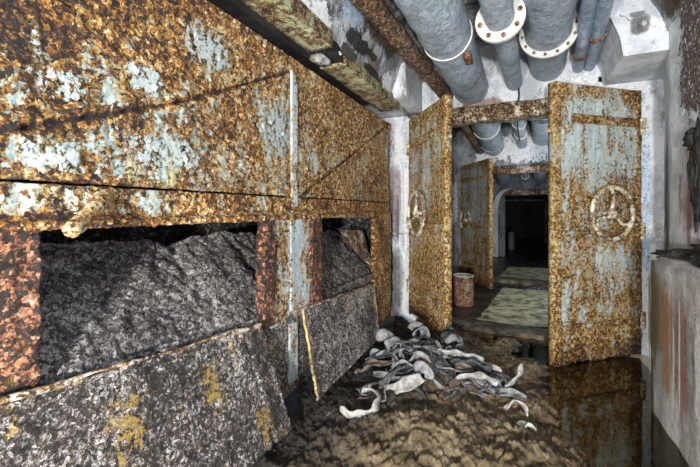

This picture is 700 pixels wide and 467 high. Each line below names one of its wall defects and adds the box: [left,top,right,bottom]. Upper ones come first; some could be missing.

damp [648,264,660,377]